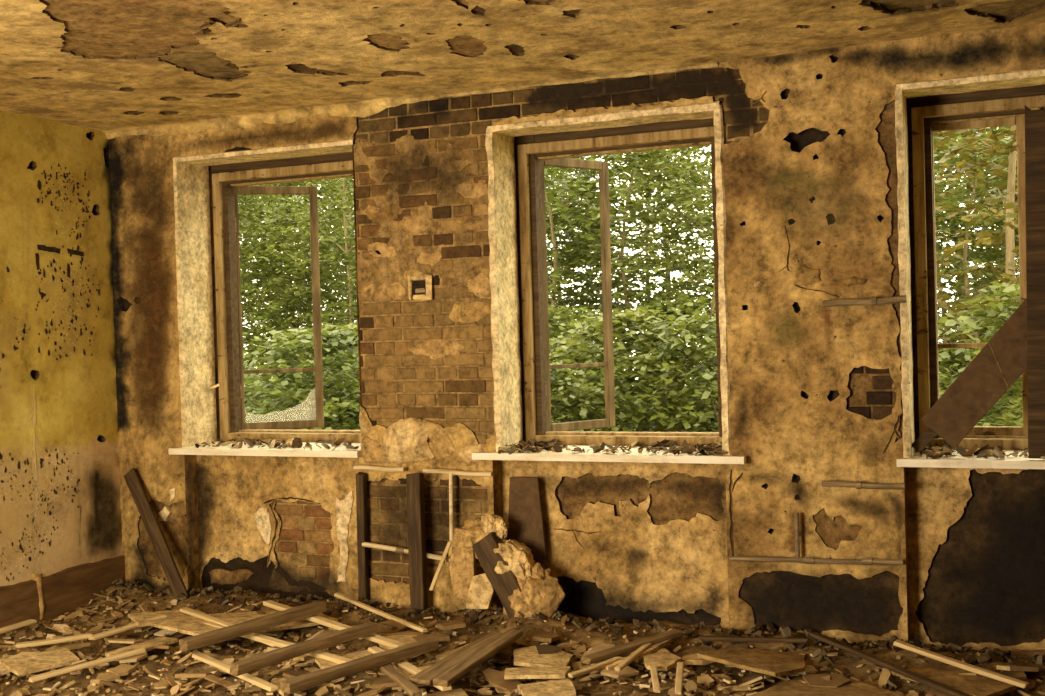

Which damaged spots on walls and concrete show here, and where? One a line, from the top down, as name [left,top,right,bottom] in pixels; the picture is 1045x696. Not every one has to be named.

peeling [456,0,485,13]
peeling [861,0,1045,24]
hole [785,129,846,153]
leakage [103,139,163,428]
flaking render [353,66,769,444]
flaking render [828,101,910,442]
leakage [80,473,121,549]
flaking render [150,487,191,580]
flaking render [203,491,354,600]
flaking render [557,472,724,524]
flaking render [739,469,1045,646]